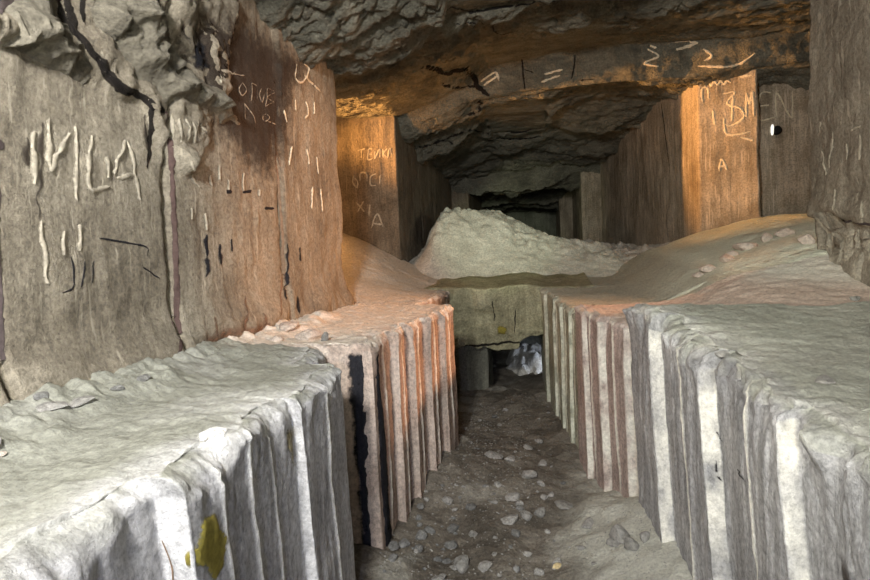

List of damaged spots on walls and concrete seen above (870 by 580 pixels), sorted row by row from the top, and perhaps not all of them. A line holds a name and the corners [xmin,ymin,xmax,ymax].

crack [0,0,14,14]
crack [57,0,183,352]
crack [0,257,8,361]